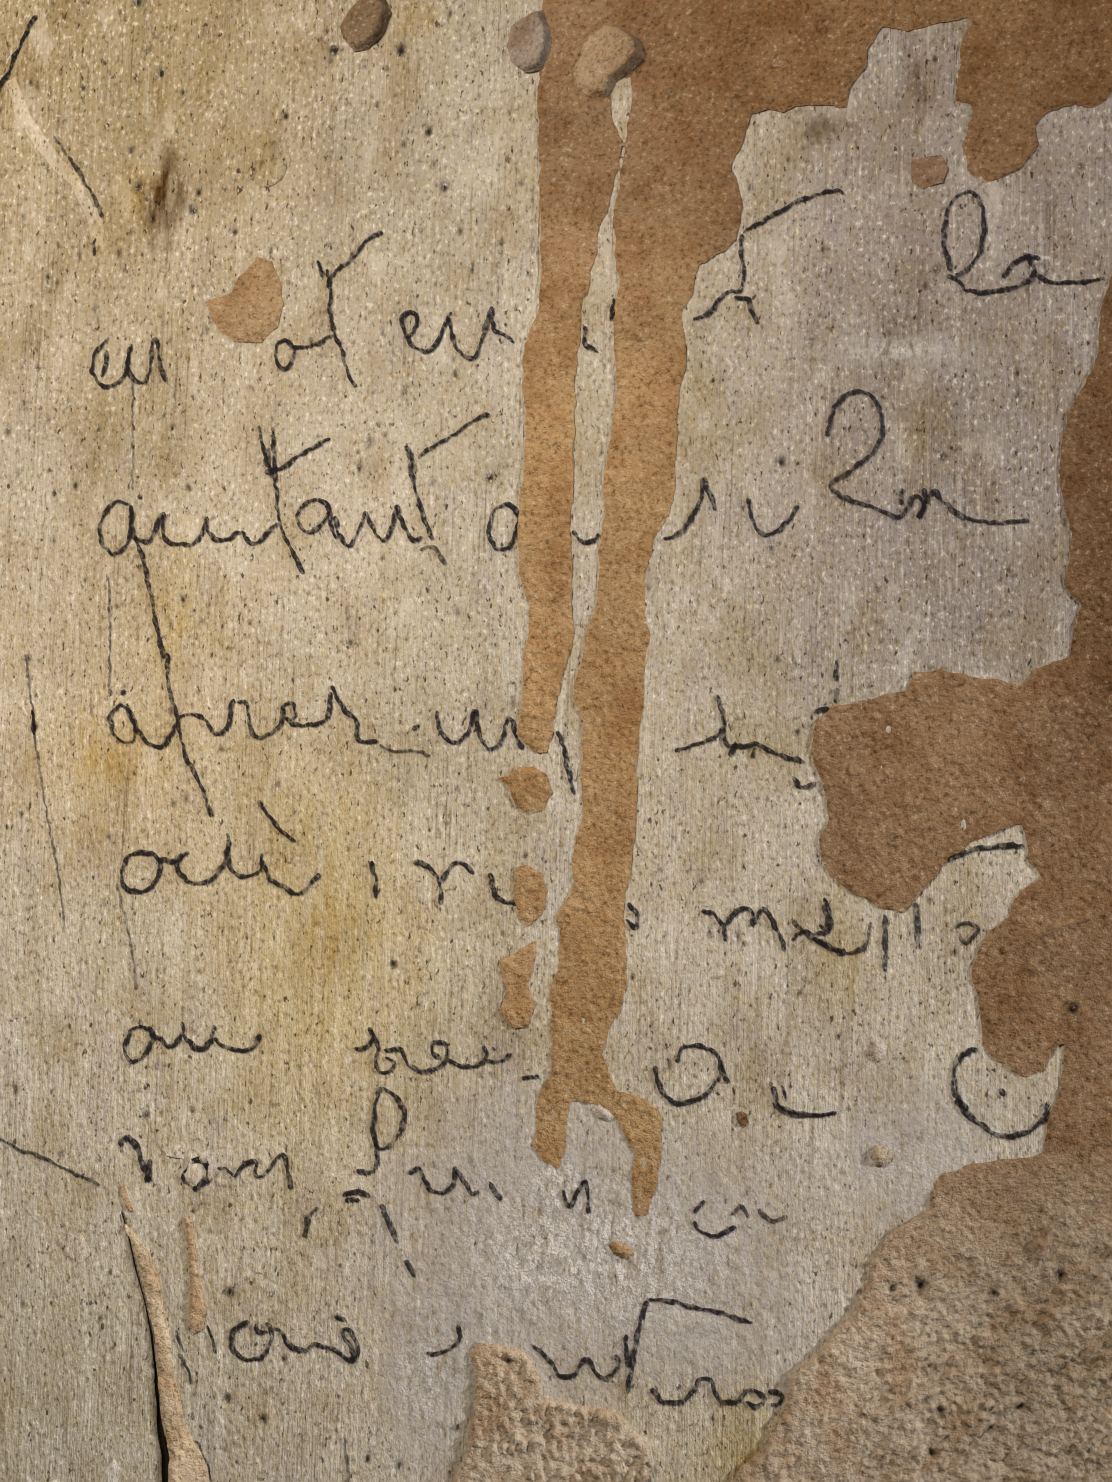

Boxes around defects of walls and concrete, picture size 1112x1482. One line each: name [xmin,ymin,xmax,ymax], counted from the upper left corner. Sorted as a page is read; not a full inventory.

peeling [205,257,284,343]
peeling [499,0,1112,1218]
peeling [733,276,1112,1482]
peeling [101,1459,122,1482]
spalling [453,1342,655,1482]